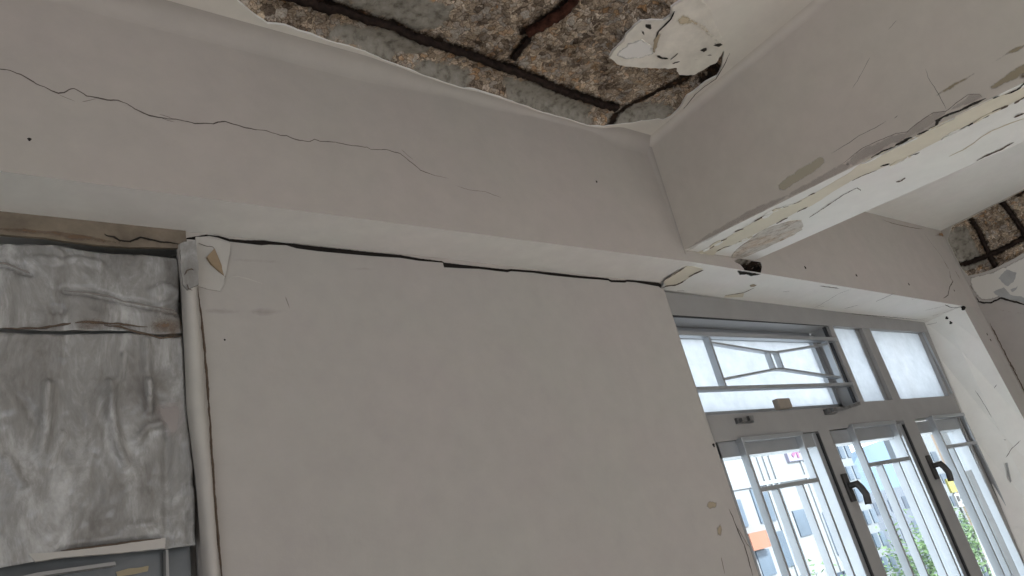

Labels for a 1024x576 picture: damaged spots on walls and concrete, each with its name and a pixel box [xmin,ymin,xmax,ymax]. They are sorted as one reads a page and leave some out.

spalling [237,0,725,127]
crack [0,69,499,197]
peeling [686,83,1024,302]
crack [105,232,662,288]
peeling [663,266,703,288]